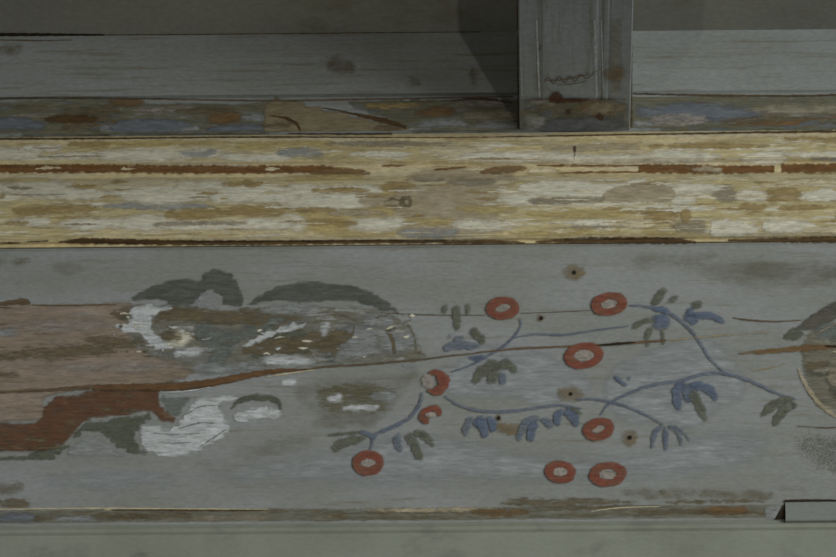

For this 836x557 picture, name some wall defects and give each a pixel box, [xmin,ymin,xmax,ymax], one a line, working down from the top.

peeling [0,20,836,240]
crack [0,345,574,393]
crack [597,317,836,371]